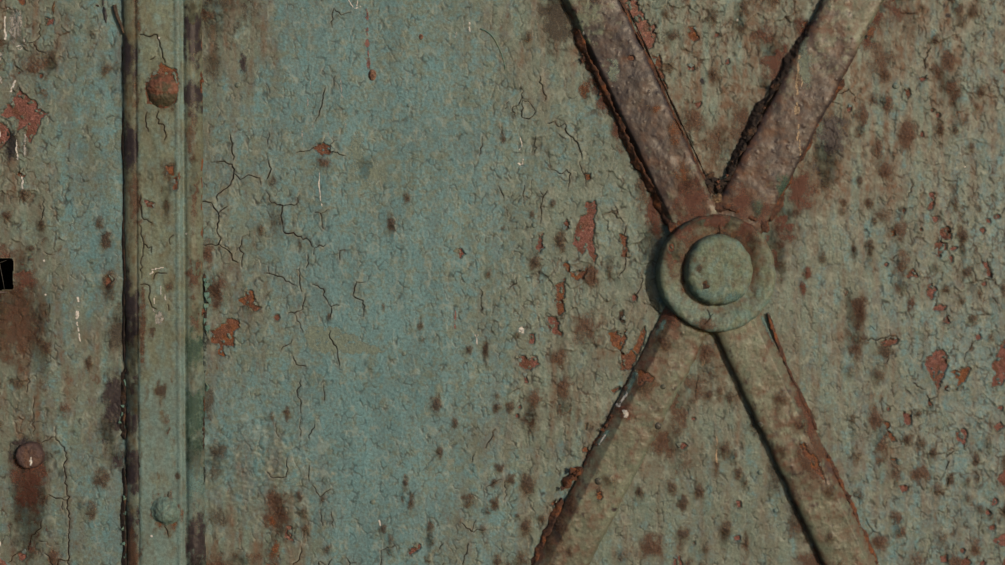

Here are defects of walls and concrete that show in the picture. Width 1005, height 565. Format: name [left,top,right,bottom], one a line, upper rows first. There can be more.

peeling [0,90,48,148]
crack [297,70,345,156]
crack [479,77,586,216]
corrosion [573,0,893,268]
corrosion [931,35,960,137]
corrosion [93,5,308,565]
peeling [202,273,241,357]
crack [203,135,365,436]
peeling [545,200,597,337]
peeling [608,310,654,395]
corrosion [845,291,867,359]
crack [267,460,334,526]